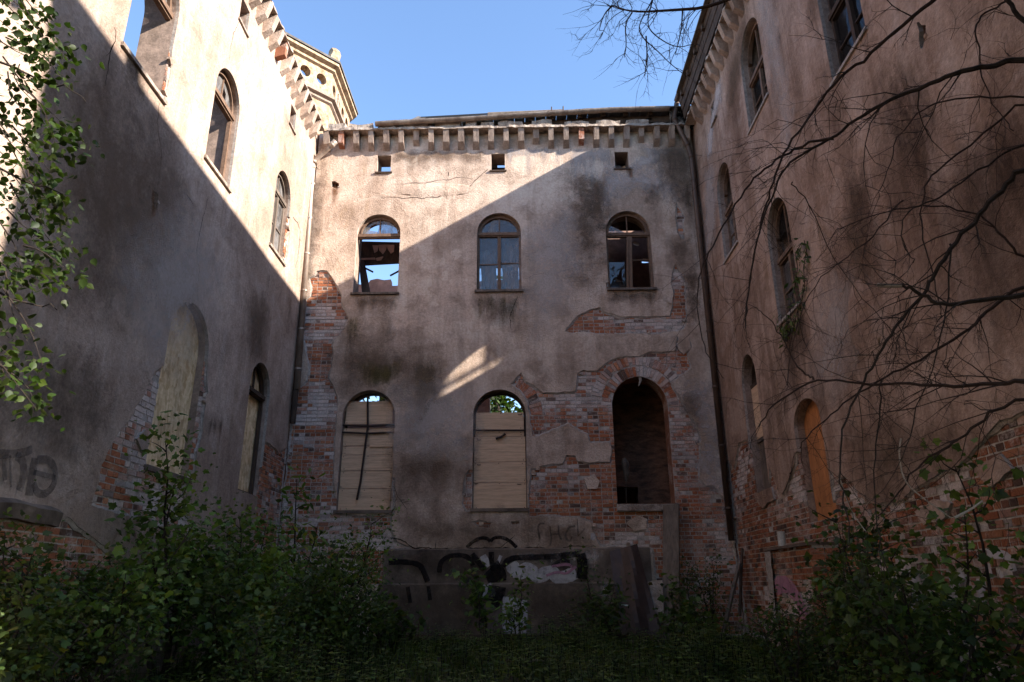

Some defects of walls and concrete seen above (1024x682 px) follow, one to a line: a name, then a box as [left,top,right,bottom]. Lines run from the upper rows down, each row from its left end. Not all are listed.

crack [382,169,488,199]
flaking render [91,353,209,533]
flaking render [252,270,411,597]
flaking render [511,264,1024,681]
flaking render [0,517,131,619]